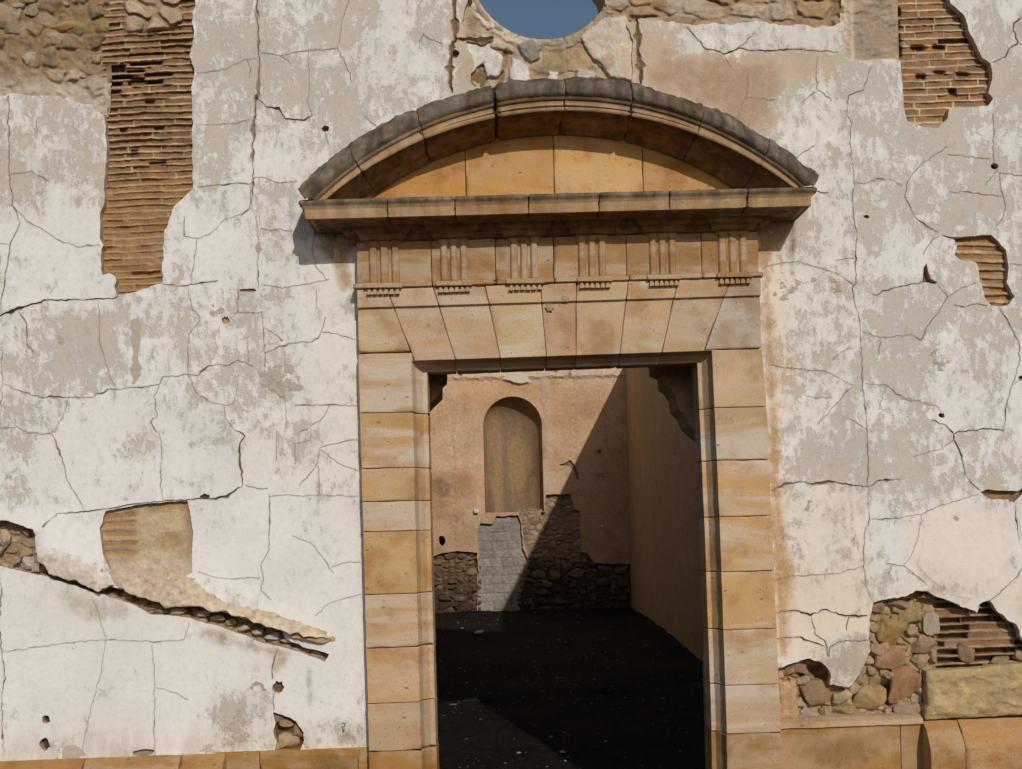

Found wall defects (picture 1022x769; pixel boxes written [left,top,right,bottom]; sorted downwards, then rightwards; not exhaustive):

spalling [453,0,989,128]
crack [994,17,1022,63]
spalling [0,0,195,295]
crack [0,0,361,600]
crack [686,28,1022,657]
spalling [954,236,1011,306]
spalling [100,501,193,578]
spalling [0,521,329,660]
spalling [434,551,482,613]
crack [0,585,189,754]
spalling [275,713,304,749]
spalling [778,591,1022,720]